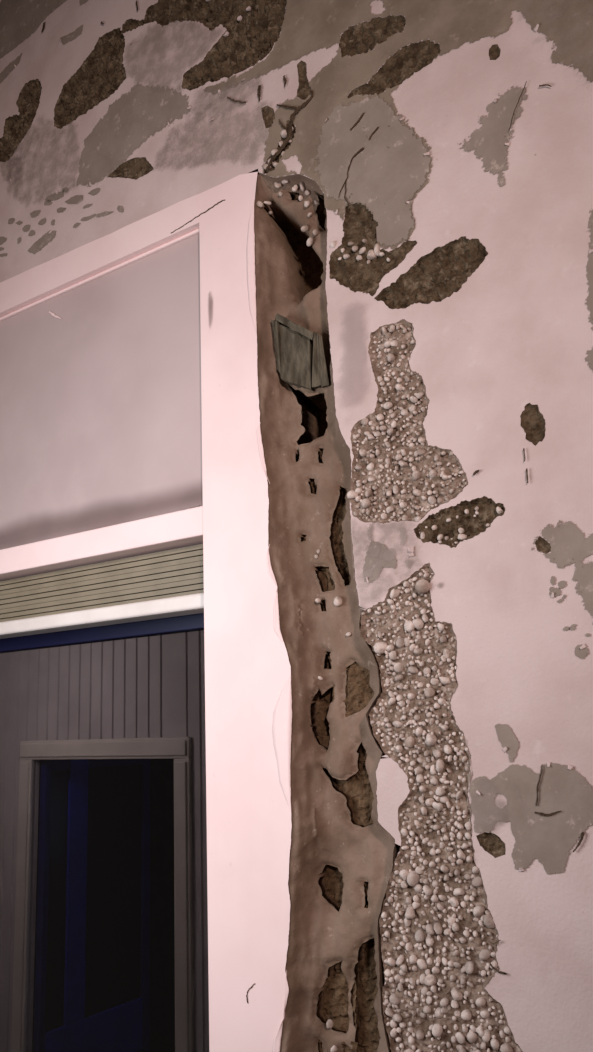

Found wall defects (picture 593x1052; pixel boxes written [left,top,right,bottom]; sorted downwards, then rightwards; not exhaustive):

spalling [0,79,42,197]
peeling [8,210,56,254]
peeling [36,179,69,205]
crack [227,75,313,171]
peeling [54,0,593,296]
spalling [247,173,593,1052]